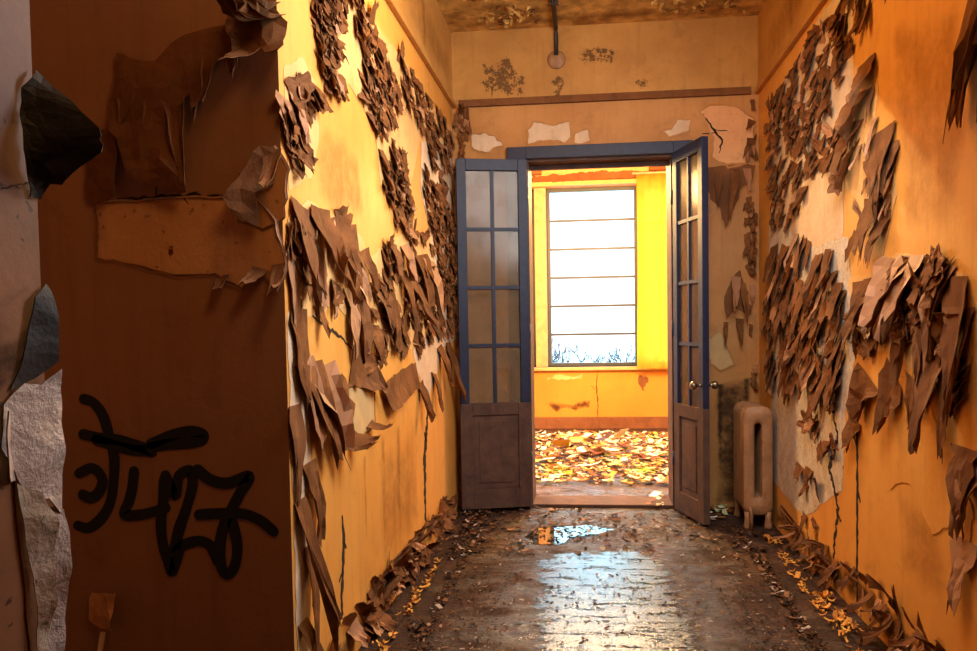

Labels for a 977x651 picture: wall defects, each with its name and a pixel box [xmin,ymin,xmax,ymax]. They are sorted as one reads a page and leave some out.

spalling [482,57,524,95]
peeling [526,120,591,146]
spalling [582,48,614,63]
peeling [0,283,73,651]
peeling [20,0,504,651]
peeling [650,0,977,651]